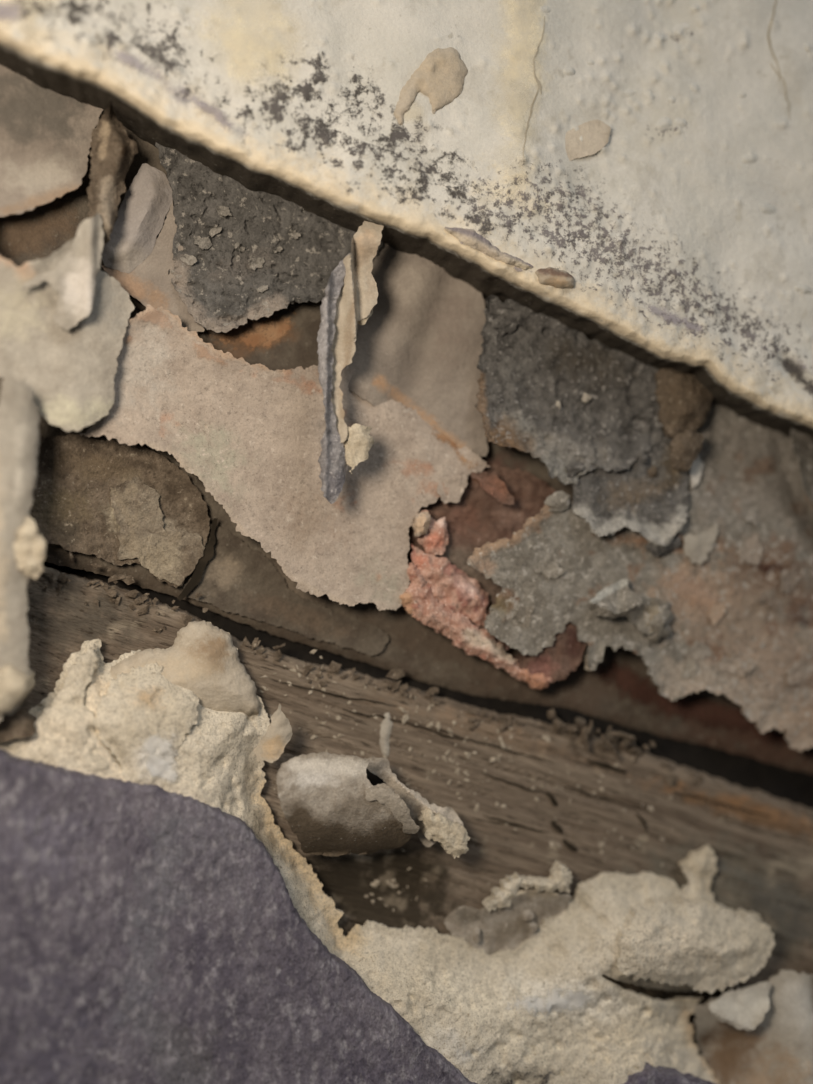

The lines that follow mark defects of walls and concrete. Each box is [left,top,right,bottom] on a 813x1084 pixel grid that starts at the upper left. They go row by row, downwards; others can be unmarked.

leakage [0,0,213,78]
leakage [175,52,813,394]
peeling [0,65,813,752]
peeling [110,620,470,859]